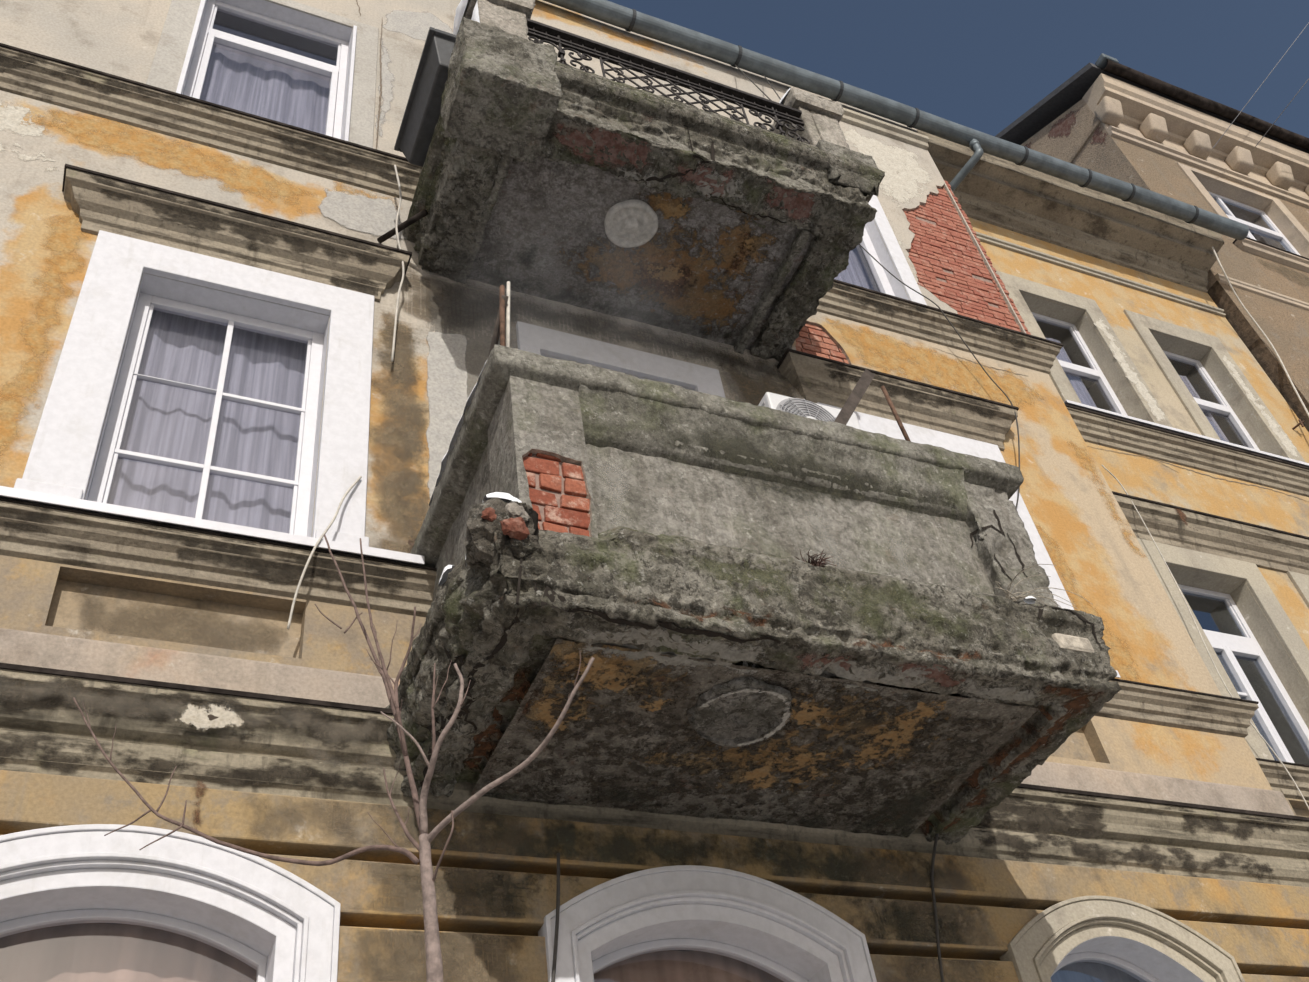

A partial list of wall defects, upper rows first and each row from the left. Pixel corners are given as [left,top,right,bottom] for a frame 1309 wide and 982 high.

crack [356,0,383,149]
flaking render [842,127,1031,335]
leakage [147,247,793,595]
peeling [795,318,1044,408]
leakage [0,507,72,533]
flaking render [465,449,592,571]
leakage [0,676,391,837]
spalling [193,781,206,823]
spalling [176,704,244,729]
crack [420,558,781,787]
leakage [973,789,1301,882]